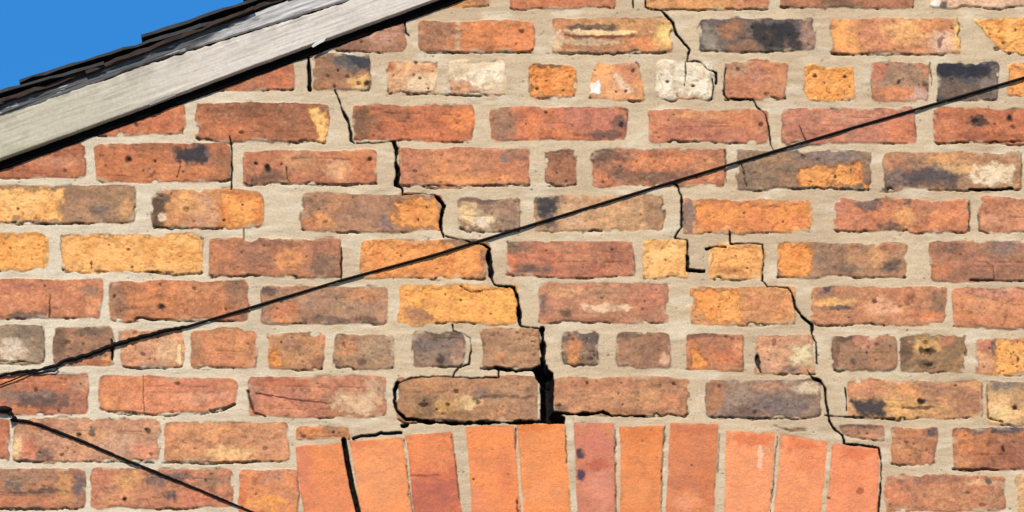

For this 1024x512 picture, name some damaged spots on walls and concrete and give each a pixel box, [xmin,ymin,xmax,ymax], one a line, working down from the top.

crack [632,0,772,147]
crack [307,58,645,512]
crack [673,183,882,512]